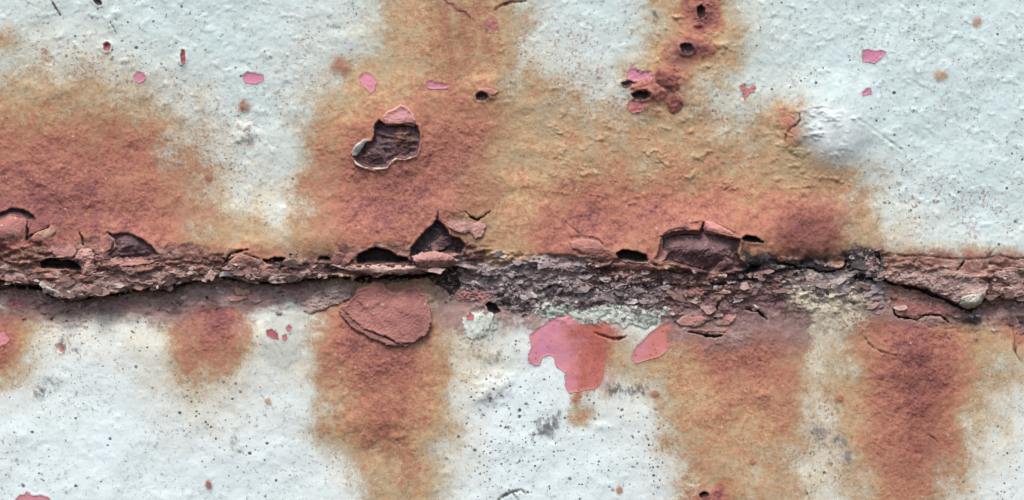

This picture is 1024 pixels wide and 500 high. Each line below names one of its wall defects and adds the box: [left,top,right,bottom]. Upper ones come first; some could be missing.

peeling [621,65,653,88]
corrosion [0,0,869,347]
peeling [446,219,486,239]
corrosion [0,279,318,389]
peeling [226,287,262,303]
corrosion [309,294,458,500]
peeling [528,315,606,393]
peeling [632,323,673,363]
corrosion [578,290,812,500]
corrosion [821,246,1024,500]